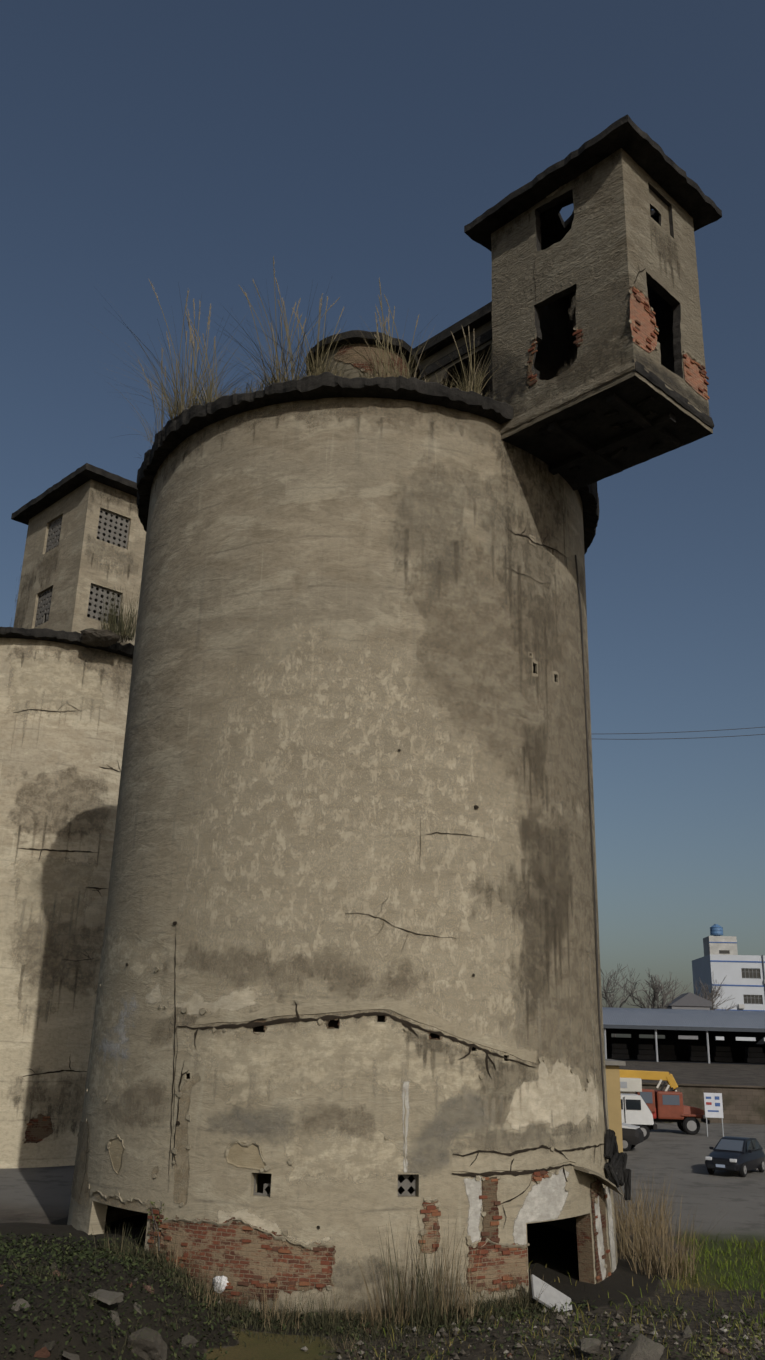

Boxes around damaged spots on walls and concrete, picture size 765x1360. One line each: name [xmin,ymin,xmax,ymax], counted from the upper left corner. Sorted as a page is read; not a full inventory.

spalling [628,284,659,353]
spalling [683,350,710,400]
water stain [11,768,107,836]
peeling [98,620,529,1106]
crack [158,921,537,1254]
spalling [71,1119,336,1308]
peeling [282,1126,410,1184]
spalling [418,1196,441,1254]
spalling [464,1169,570,1297]
crack [451,1143,605,1228]